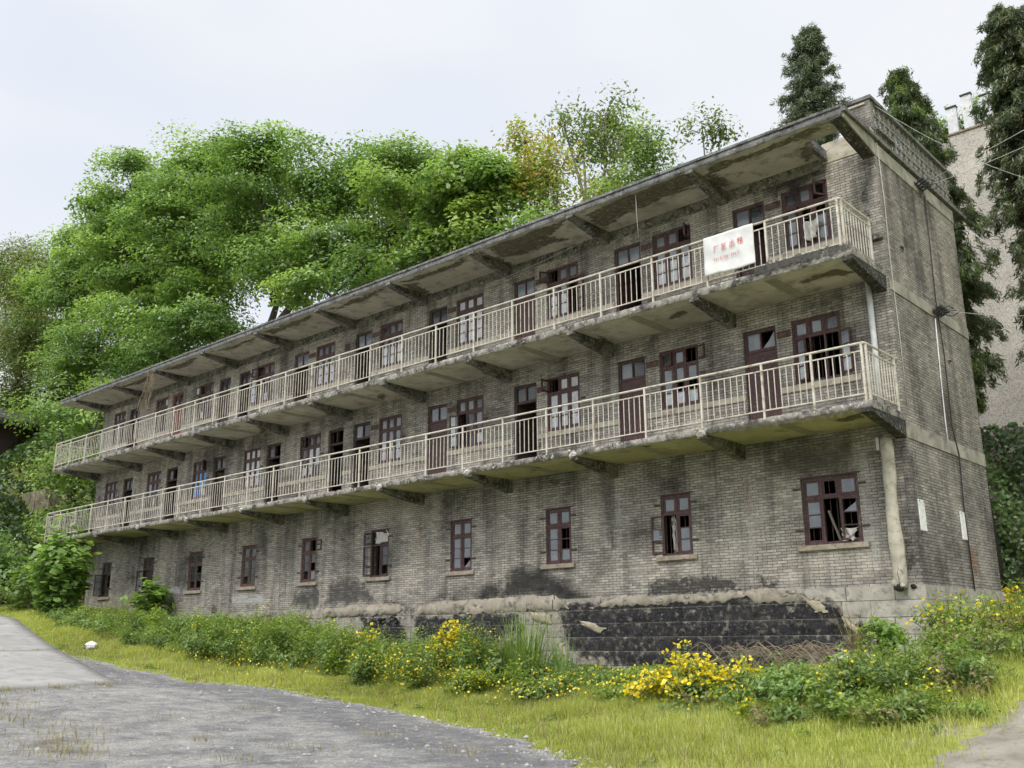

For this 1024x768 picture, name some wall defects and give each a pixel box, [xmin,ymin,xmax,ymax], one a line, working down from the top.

peeling [323,594,569,624]
spalling [580,621,607,633]
peeling [589,587,828,613]
water stain [559,575,876,669]